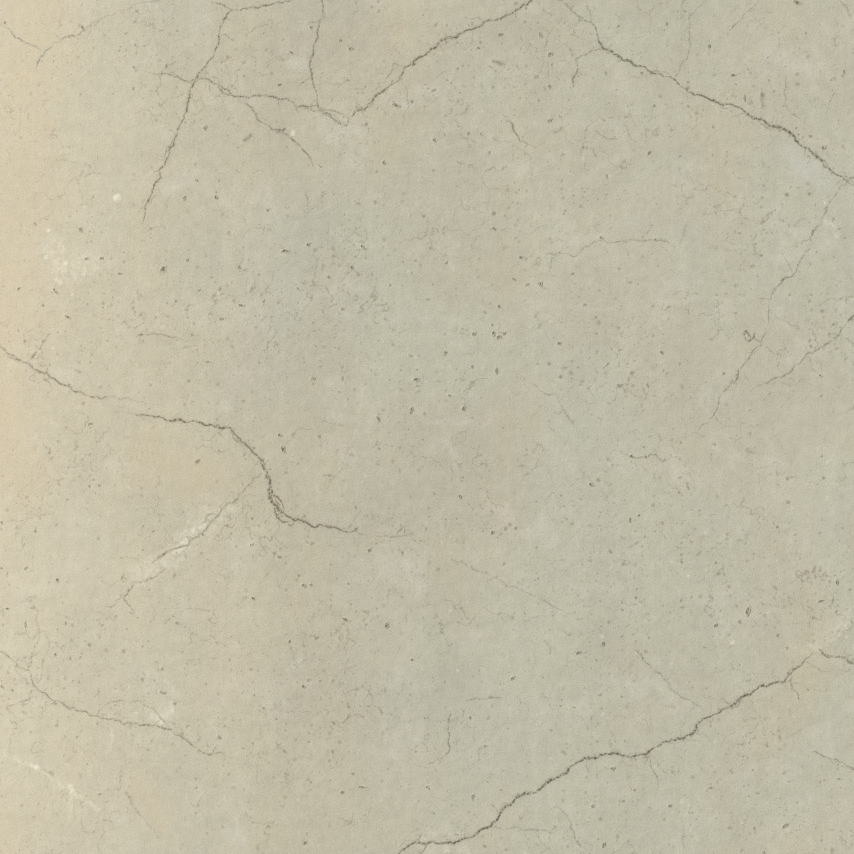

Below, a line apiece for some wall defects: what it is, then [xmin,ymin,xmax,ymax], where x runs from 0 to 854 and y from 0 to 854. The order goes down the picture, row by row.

crack [0,0,183,73]
crack [136,0,854,463]
crack [0,333,563,613]
crack [0,624,242,759]
crack [396,648,854,854]